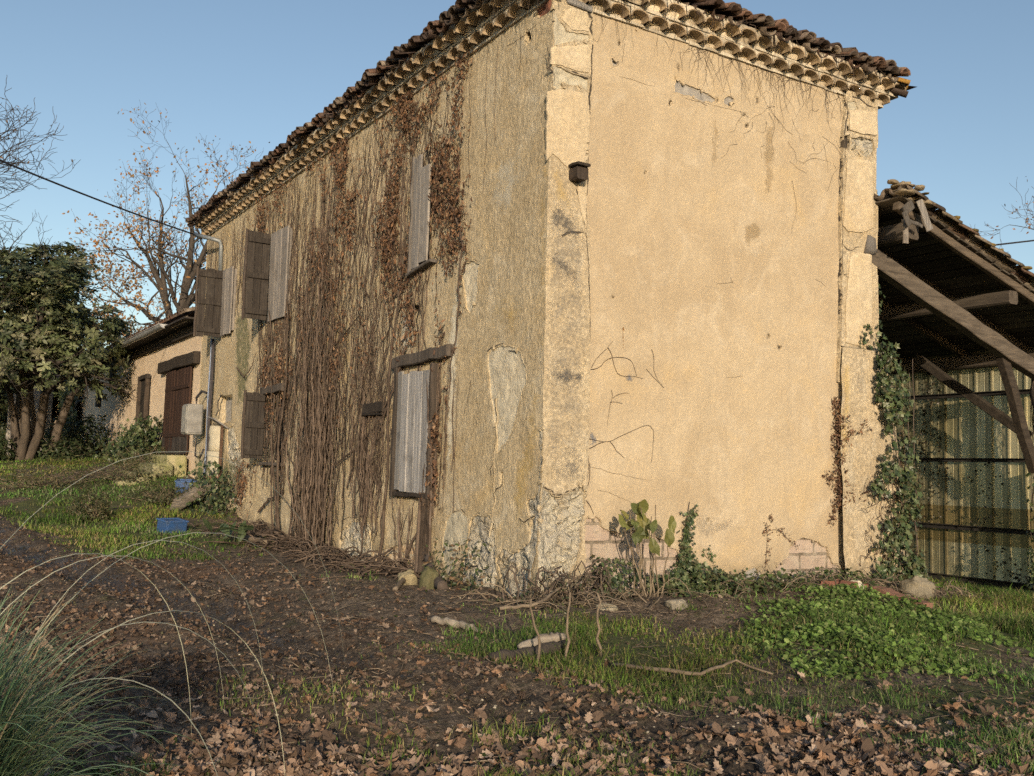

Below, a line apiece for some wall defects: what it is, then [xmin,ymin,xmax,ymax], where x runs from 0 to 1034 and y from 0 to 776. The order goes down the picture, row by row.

spalling [553,66,590,93]
spalling [668,64,735,108]
peeling [487,344,528,454]
spalling [460,422,693,604]
spalling [745,536,844,581]